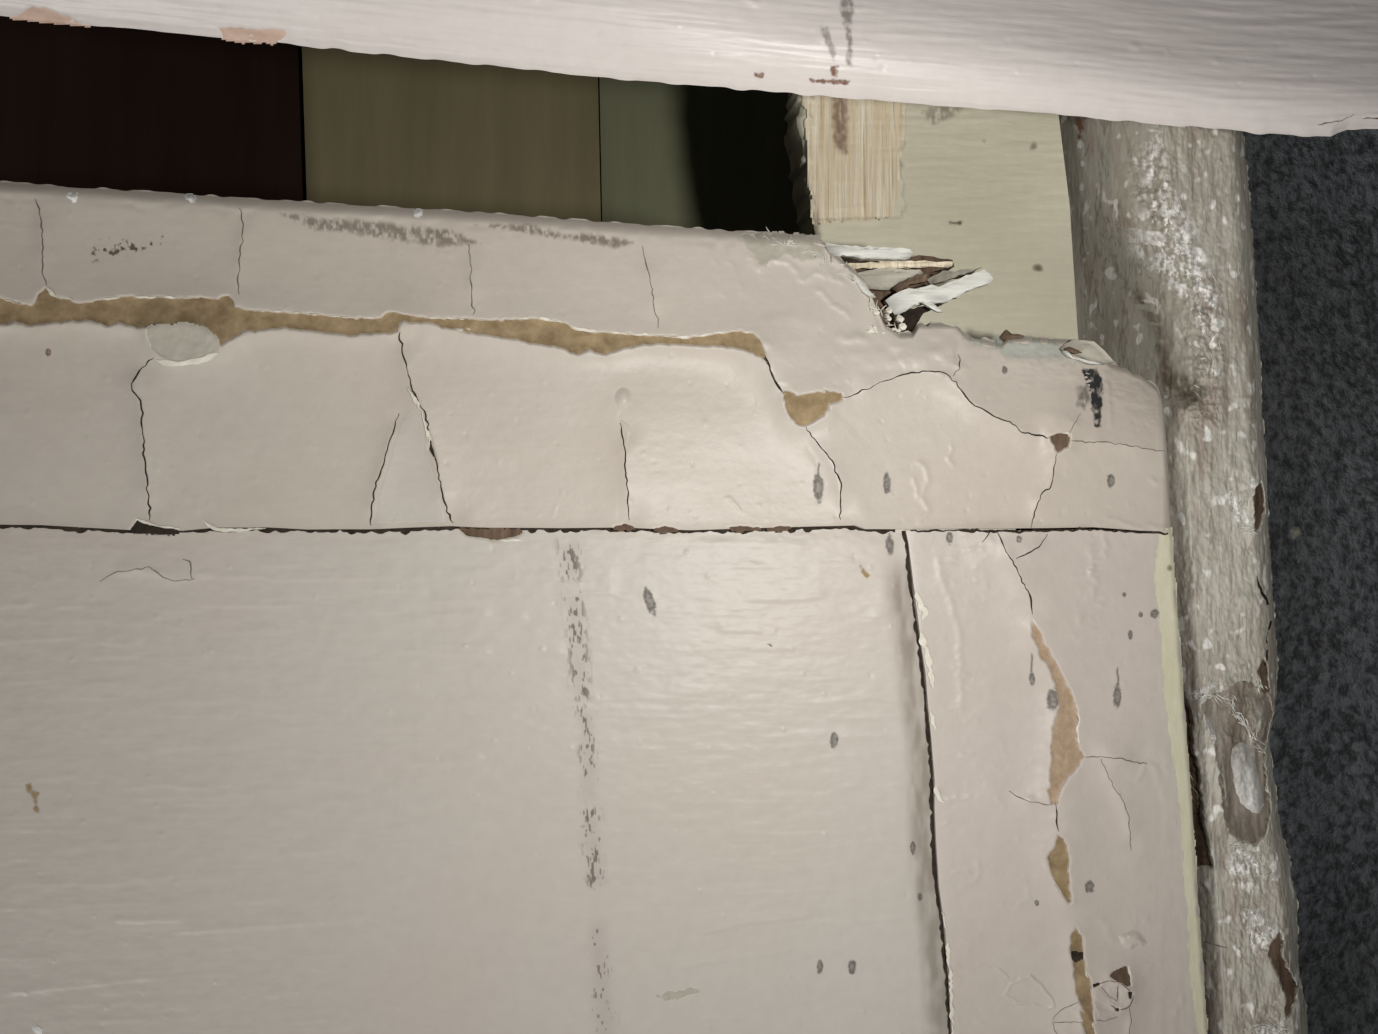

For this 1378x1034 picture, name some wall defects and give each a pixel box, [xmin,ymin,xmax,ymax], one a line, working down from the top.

crack [35,199,47,285]
crack [236,208,244,293]
peeling [0,288,765,366]
crack [467,247,475,314]
crack [642,247,659,322]
peeling [784,389,842,426]
crack [0,333,1168,1034]
peeling [1032,618,1083,804]
spalling [1154,527,1274,1034]
peeling [1048,836,1071,903]
peeling [1057,929,1132,1034]
spalling [1243,907,1296,1034]